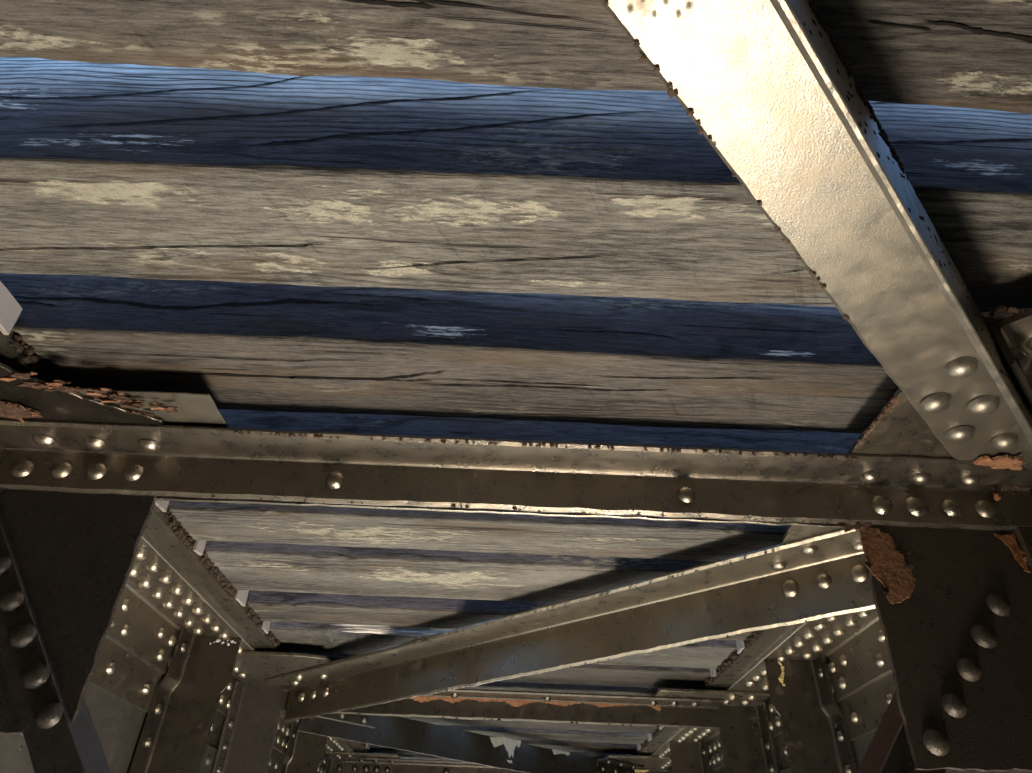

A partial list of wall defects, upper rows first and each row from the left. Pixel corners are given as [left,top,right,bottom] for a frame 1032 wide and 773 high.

rust [0,401,43,423]
rust [0,371,178,417]
rust [973,454,1023,470]
rust [802,521,916,604]
rust [994,533,1032,573]